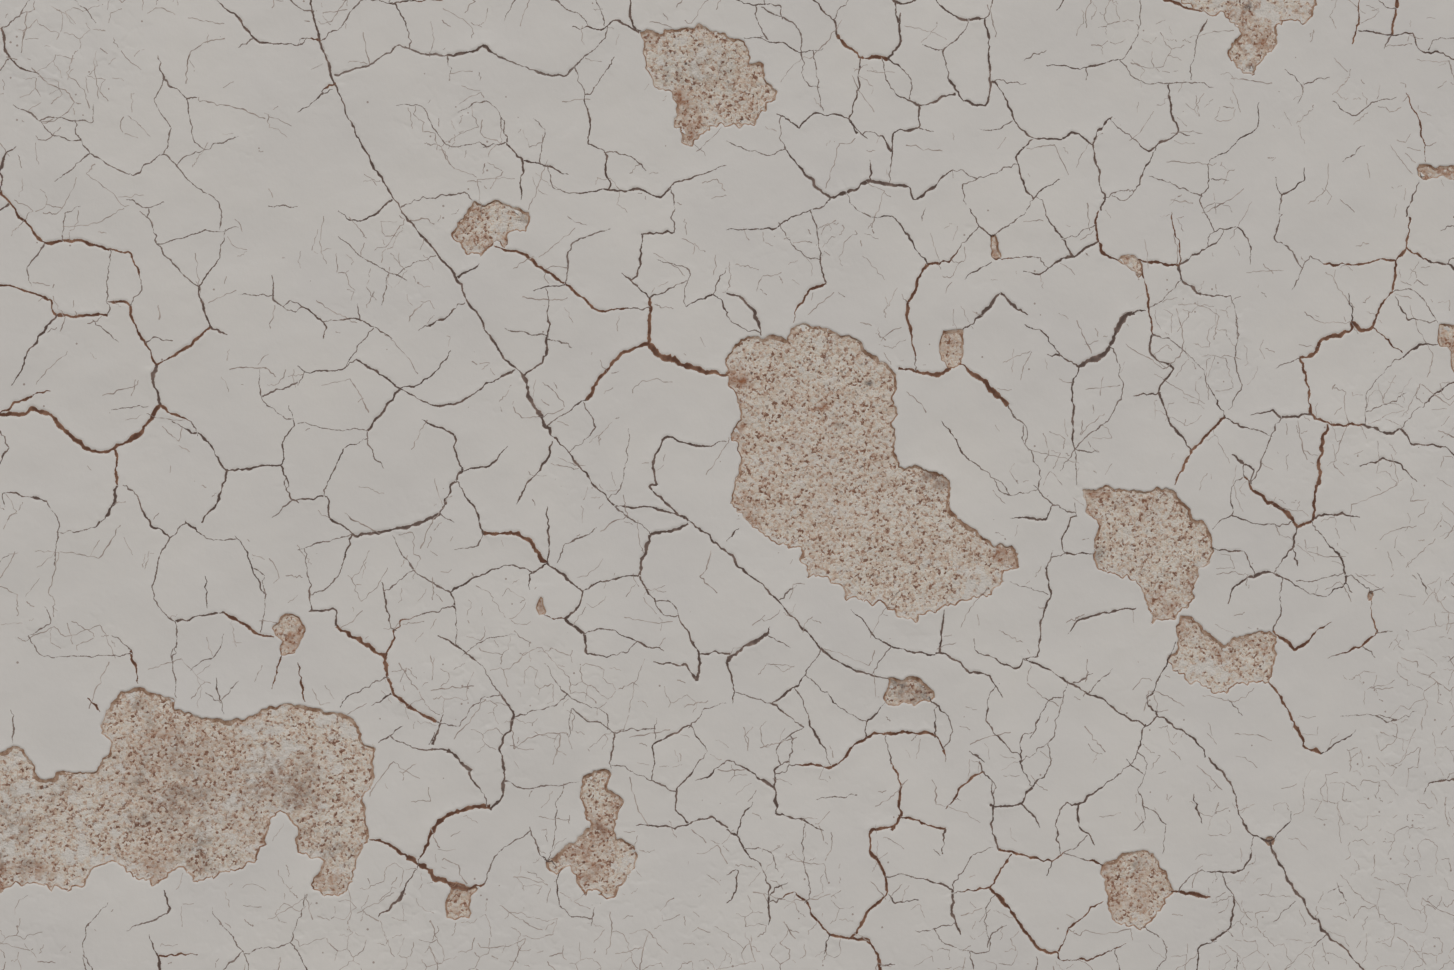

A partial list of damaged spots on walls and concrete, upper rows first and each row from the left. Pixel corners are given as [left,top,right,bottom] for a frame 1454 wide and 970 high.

peeling [640,23,778,146]
crack [1332,58,1436,173]
peeling [725,323,1019,623]
crack [1066,608,1136,634]
peeling [1083,485,1277,694]
crack [297,664,305,702]
crack [1268,681,1356,755]
peeling [0,687,376,896]
peeling [546,769,638,899]
crack [513,866,686,970]
peeling [1100,850,1174,930]
crack [1331,839,1454,969]